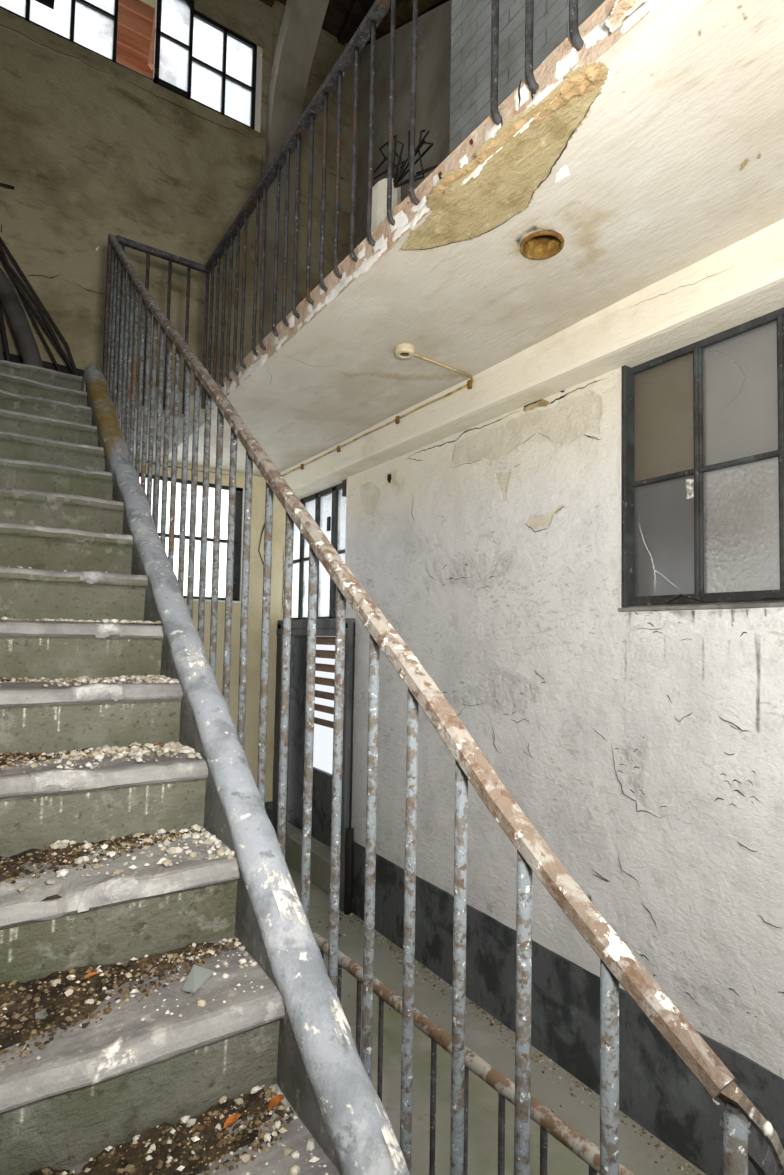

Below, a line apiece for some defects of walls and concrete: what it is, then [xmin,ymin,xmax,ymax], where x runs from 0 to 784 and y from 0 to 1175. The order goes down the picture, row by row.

spalling [211,0,662,409]
peeling [525,502,566,531]
crack [594,730,668,819]
crack [667,695,752,795]
crack [737,841,759,855]